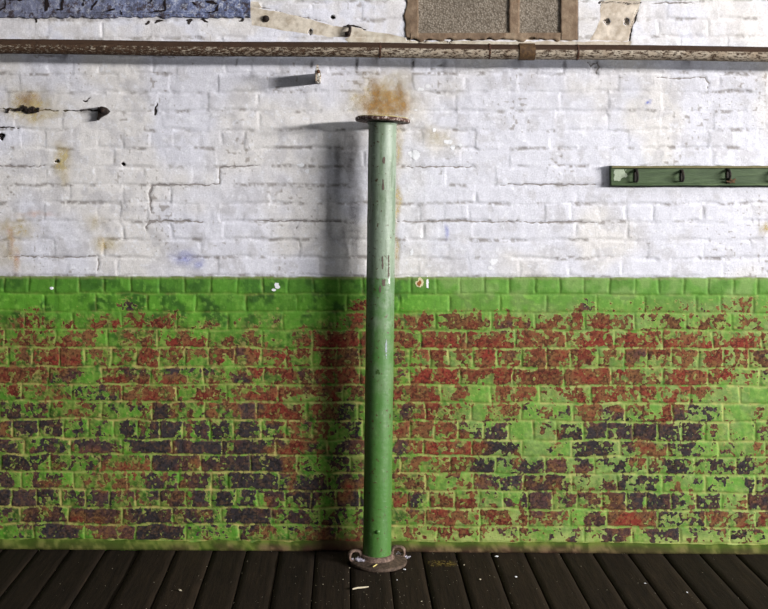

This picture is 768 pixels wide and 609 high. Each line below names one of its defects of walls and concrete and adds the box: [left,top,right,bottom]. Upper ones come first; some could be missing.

corrosion [17,95,41,120]
crack [0,97,98,129]
corrosion [364,86,406,115]
peeling [0,296,366,541]
peeling [392,297,768,544]